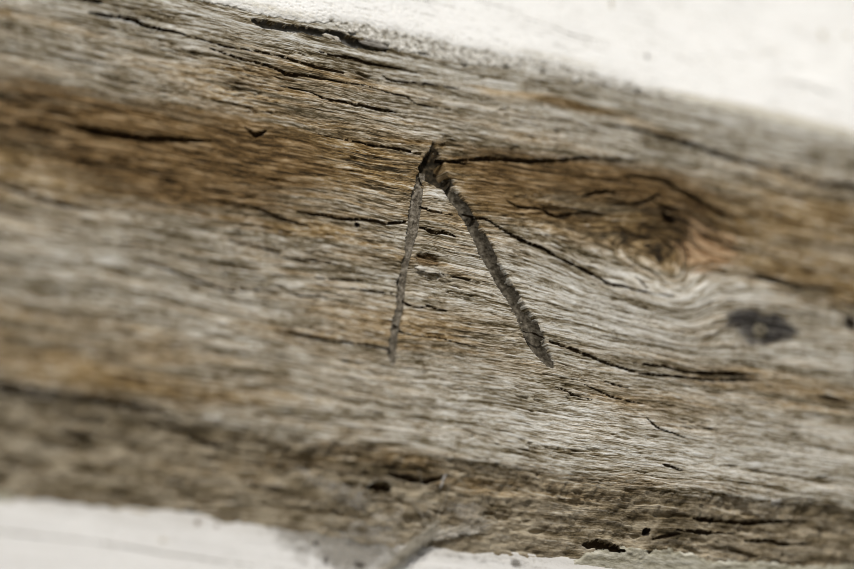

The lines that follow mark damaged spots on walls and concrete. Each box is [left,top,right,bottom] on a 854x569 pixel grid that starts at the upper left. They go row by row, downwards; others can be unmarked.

crack [79,0,460,113]
crack [61,157,129,169]
crack [0,122,209,144]
crack [245,127,267,138]
crack [318,133,736,250]
crack [191,200,674,297]
crack [522,331,759,438]